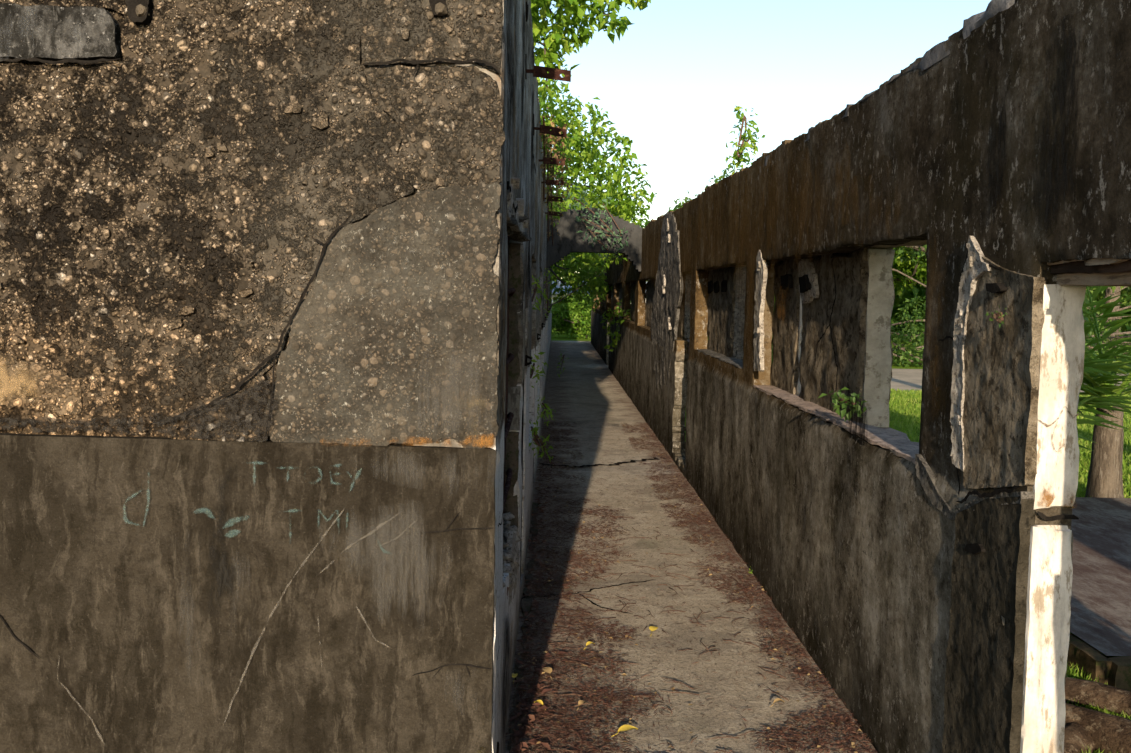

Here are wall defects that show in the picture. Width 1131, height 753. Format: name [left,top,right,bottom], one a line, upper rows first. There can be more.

water stain [1033,15,1080,232]
spalling [507,178,532,242]
crack [958,229,999,298]
crack [956,467,1020,504]
crack [1037,511,1079,521]
spalling [503,512,522,605]